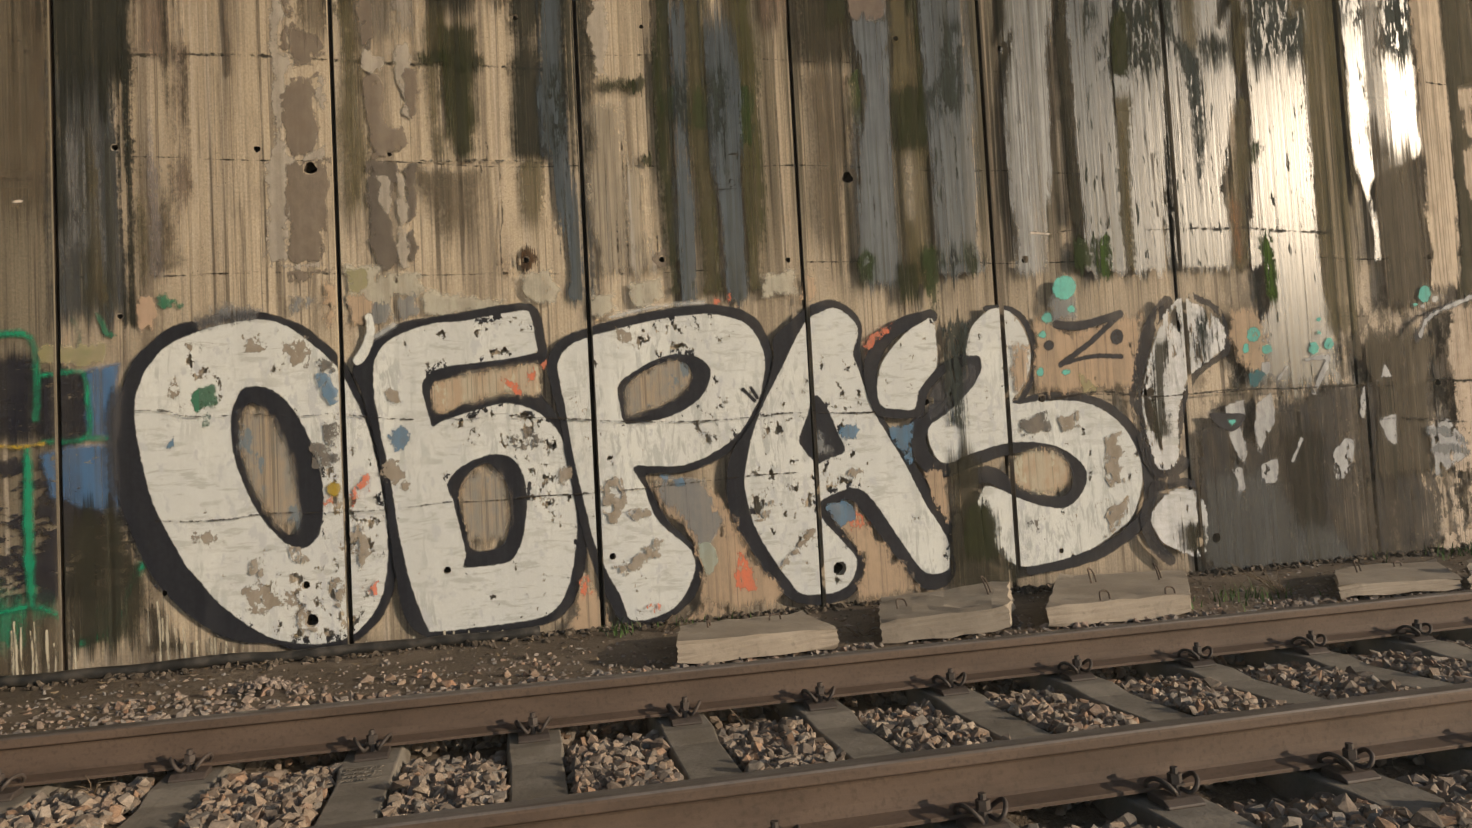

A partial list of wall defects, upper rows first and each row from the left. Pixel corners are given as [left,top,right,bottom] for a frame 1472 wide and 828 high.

peeling [167,377,218,427]
peeling [241,333,411,572]
peeling [510,427,543,451]
peeling [191,530,218,546]
peeling [241,557,317,635]